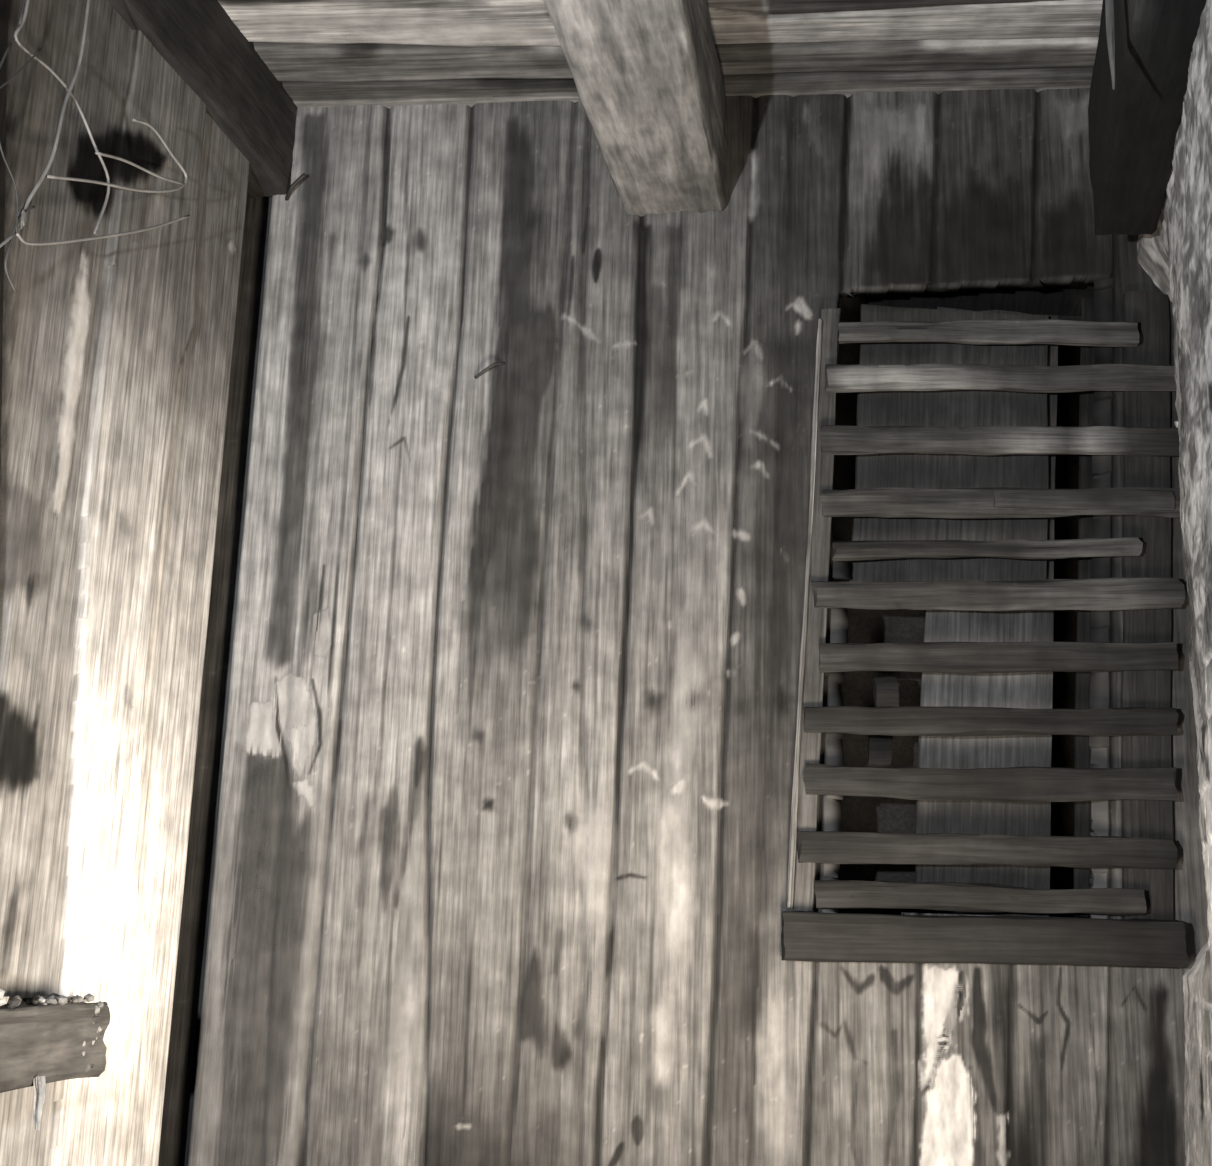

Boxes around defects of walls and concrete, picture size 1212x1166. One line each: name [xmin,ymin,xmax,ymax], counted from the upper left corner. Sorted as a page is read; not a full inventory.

damp [471,122,554,633]
peeling [312,609,331,657]
peeling [244,674,316,806]
damp [567,816,588,847]
peeling [847,965,977,1166]
peeling [997,1113,1010,1166]